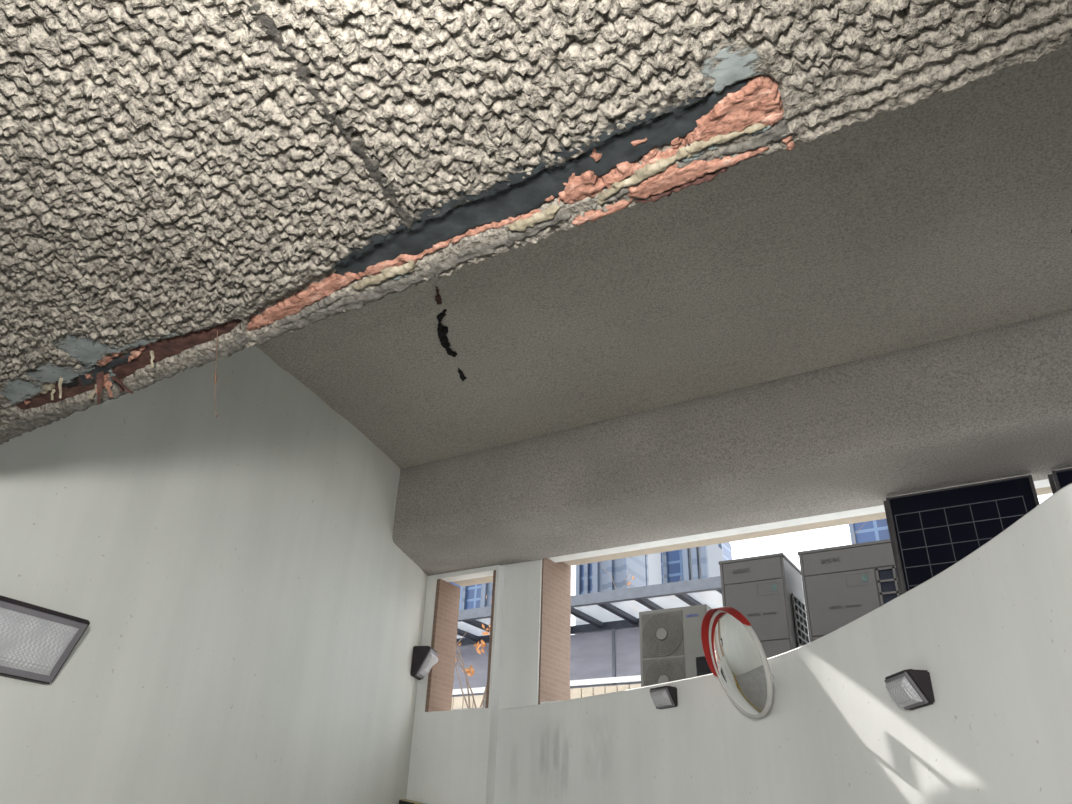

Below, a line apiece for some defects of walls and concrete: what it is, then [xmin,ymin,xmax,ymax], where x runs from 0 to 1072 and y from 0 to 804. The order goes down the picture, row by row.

crack [248,0,414,230]
spalling [0,46,790,445]
crack [435,286,467,381]
rust [781,136,795,151]